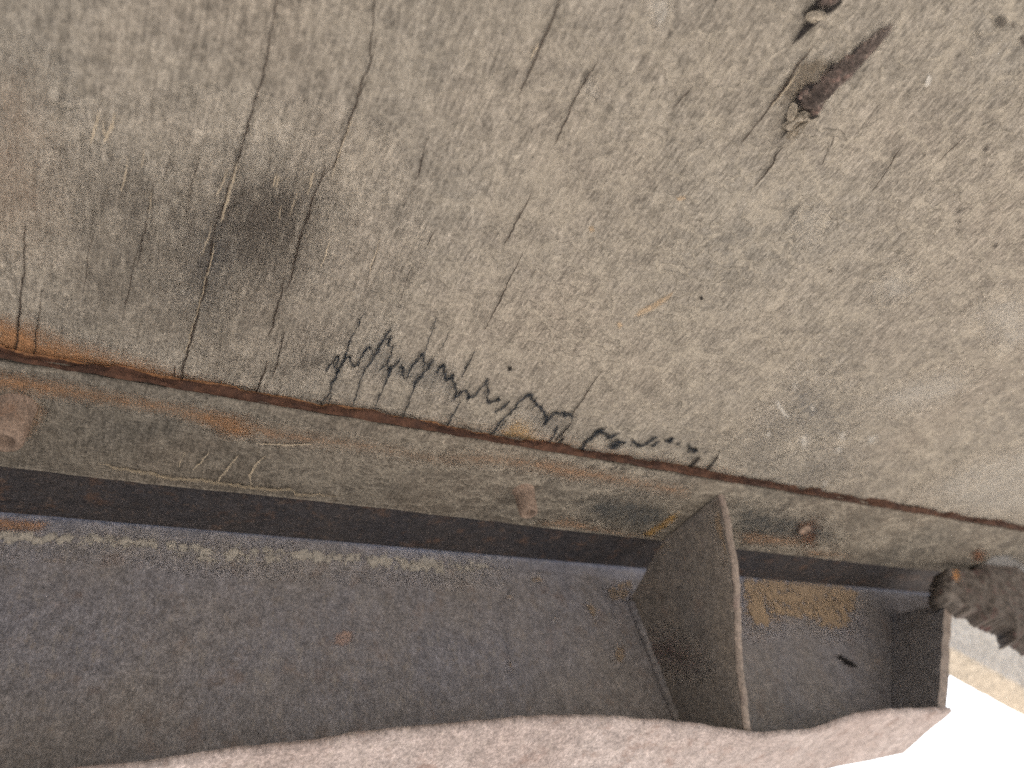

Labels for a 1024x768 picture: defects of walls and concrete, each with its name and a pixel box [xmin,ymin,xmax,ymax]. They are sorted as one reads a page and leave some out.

crack [174,0,277,380]
crack [251,0,377,393]
corrosion [0,325,1024,531]
crack [321,191,720,470]
spalling [792,0,842,44]
spalling [779,26,891,141]